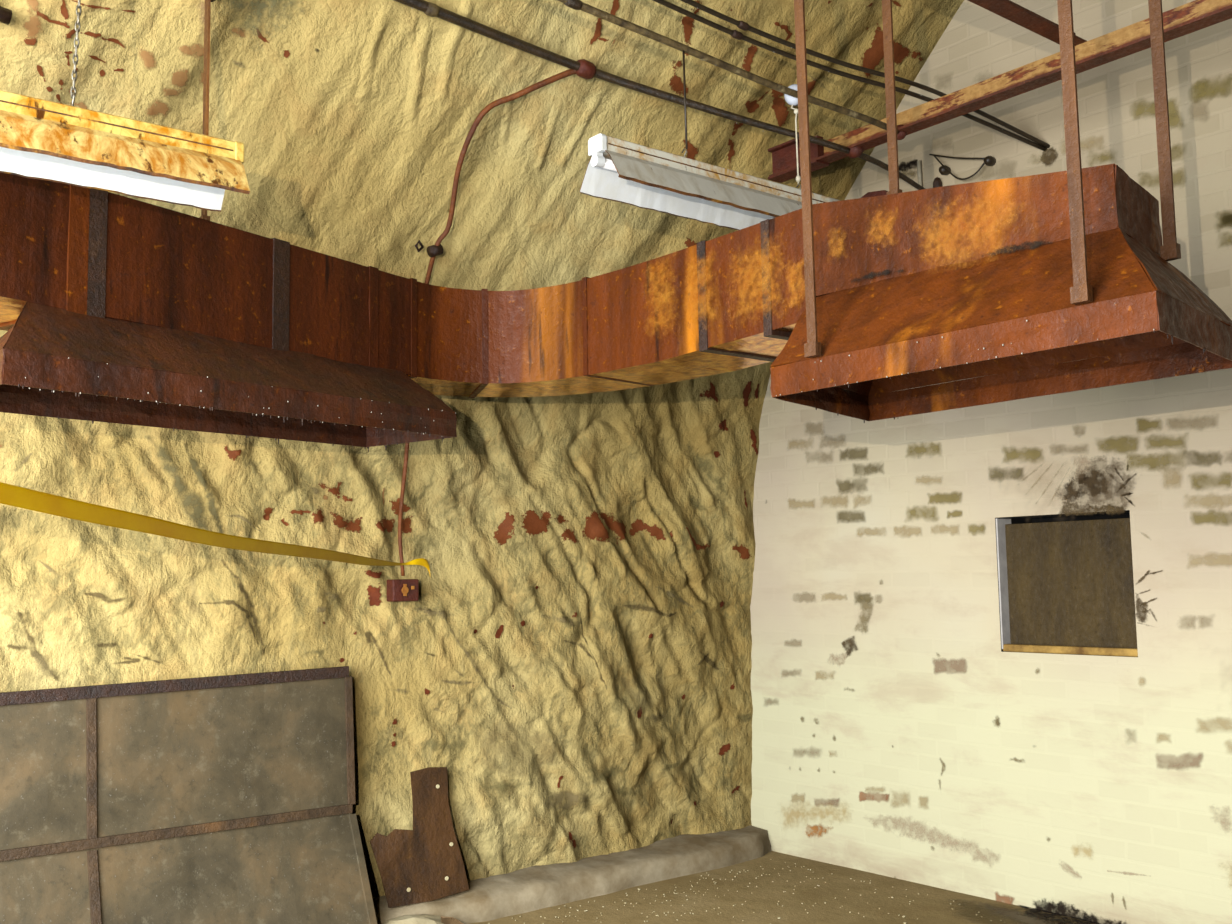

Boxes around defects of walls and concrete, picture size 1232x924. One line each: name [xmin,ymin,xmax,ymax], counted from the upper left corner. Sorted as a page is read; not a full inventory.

flaking render [1135,82,1224,126]
flaking render [1221,214,1232,244]
flaking render [990,449,1041,479]
water stain [1060,463,1132,516]
flaking render [1056,419,1232,524]
water stain [987,893,1121,924]